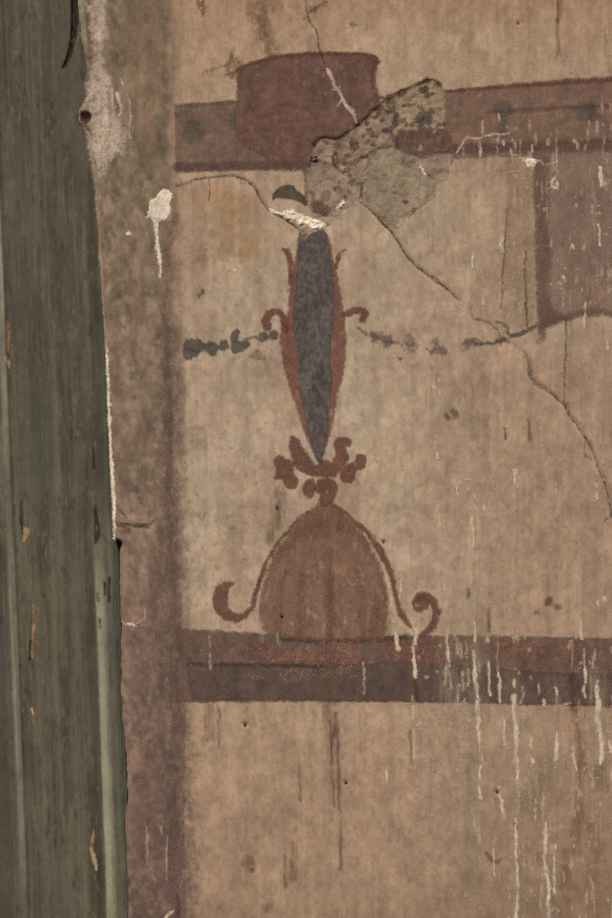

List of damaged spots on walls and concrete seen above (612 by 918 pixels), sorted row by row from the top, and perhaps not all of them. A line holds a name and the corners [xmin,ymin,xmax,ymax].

efflorescence [146,188,173,278]
crack [205,173,292,224]
crack [318,43,357,124]
flaking render [268,78,454,240]
crack [456,113,558,172]
crack [360,202,612,515]
water stain [411,619,426,770]
water stain [444,579,541,918]
water stain [542,687,566,762]
water stain [534,792,567,918]